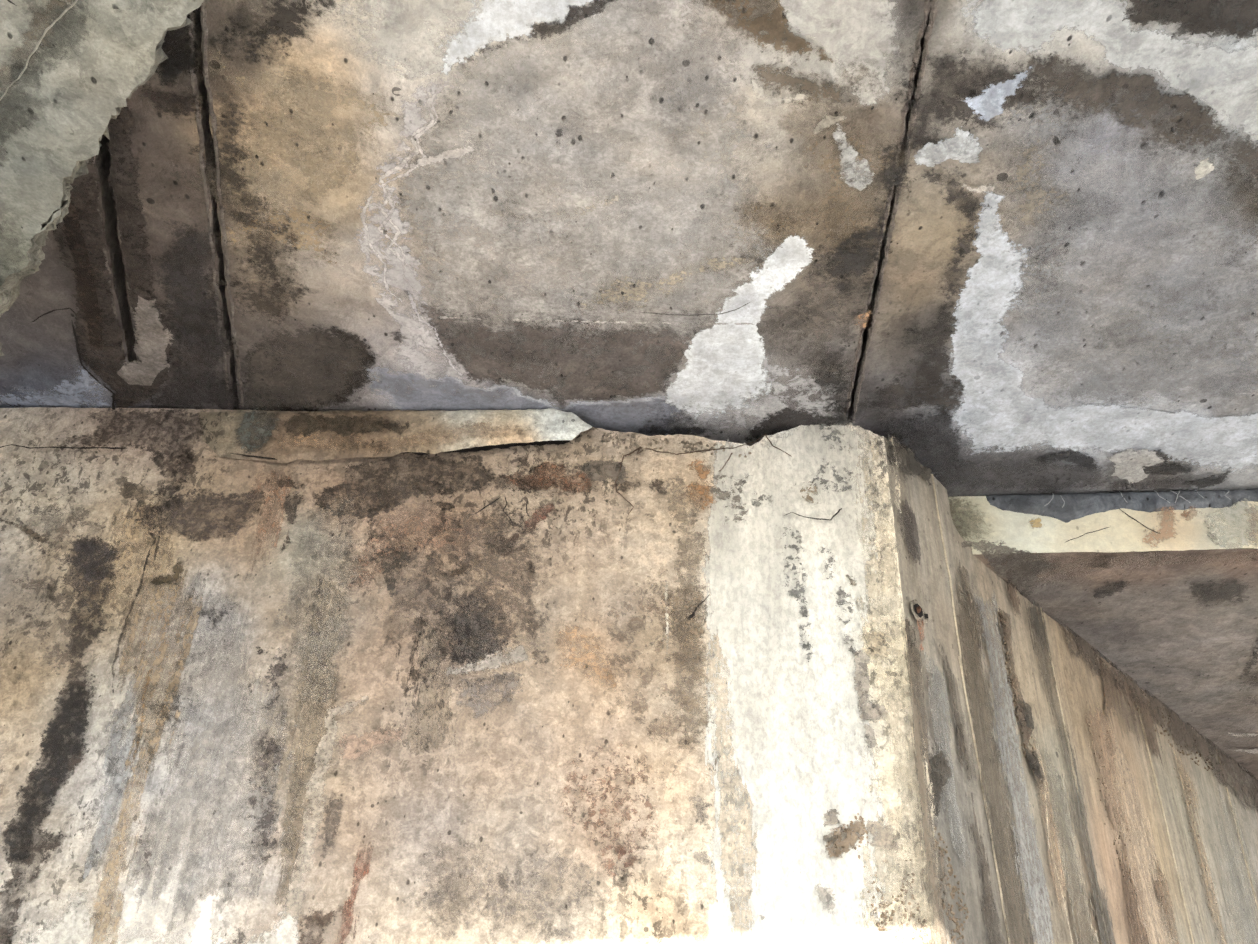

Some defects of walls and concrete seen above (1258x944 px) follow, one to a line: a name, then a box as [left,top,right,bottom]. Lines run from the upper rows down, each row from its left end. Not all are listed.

spalling [53,107,174,408]
peeling [140,0,594,463]
damp [0,0,976,944]
damp [886,434,1192,565]
damp [1094,581,1128,599]
damp [1191,580,1248,606]
damp [1205,498,1258,547]
damp [956,561,1058,944]
damp [1033,711,1116,944]
damp [1064,625,1258,944]